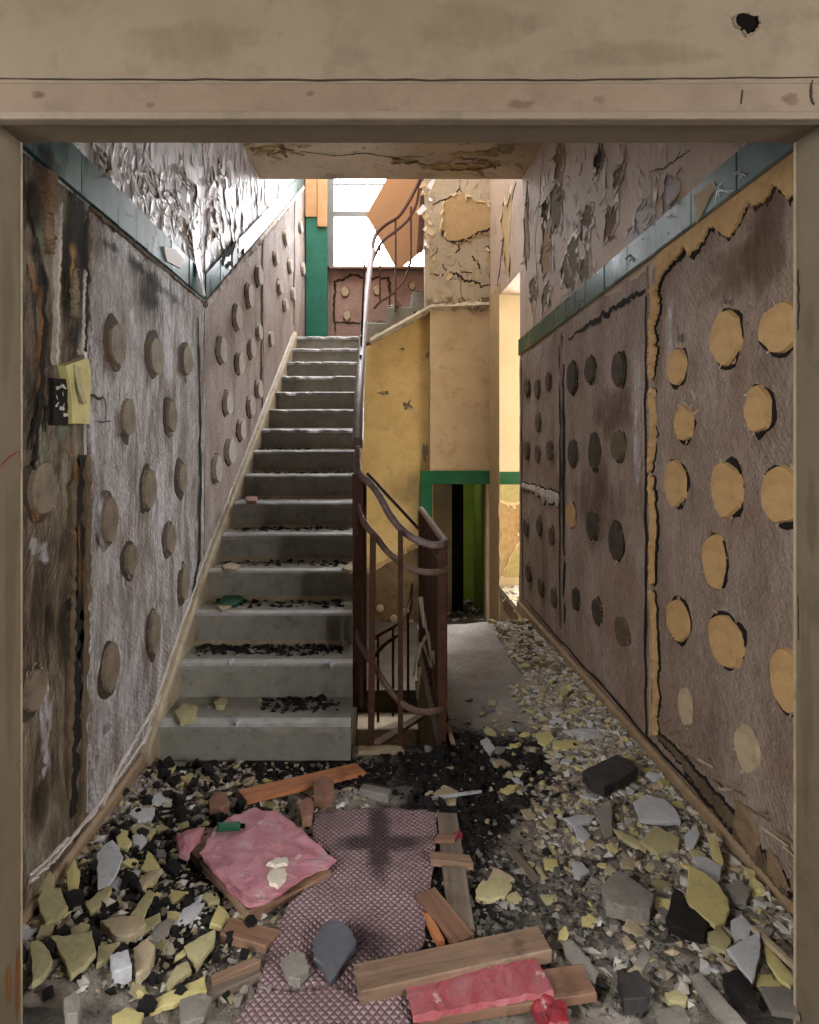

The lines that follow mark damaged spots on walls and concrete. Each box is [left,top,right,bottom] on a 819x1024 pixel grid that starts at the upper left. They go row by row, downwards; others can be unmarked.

crack [0,76,819,105]
spalling [732,13,761,42]
peeling [92,143,312,273]
crack [300,151,425,165]
flaking render [390,143,681,318]
crack [521,289,736,836]